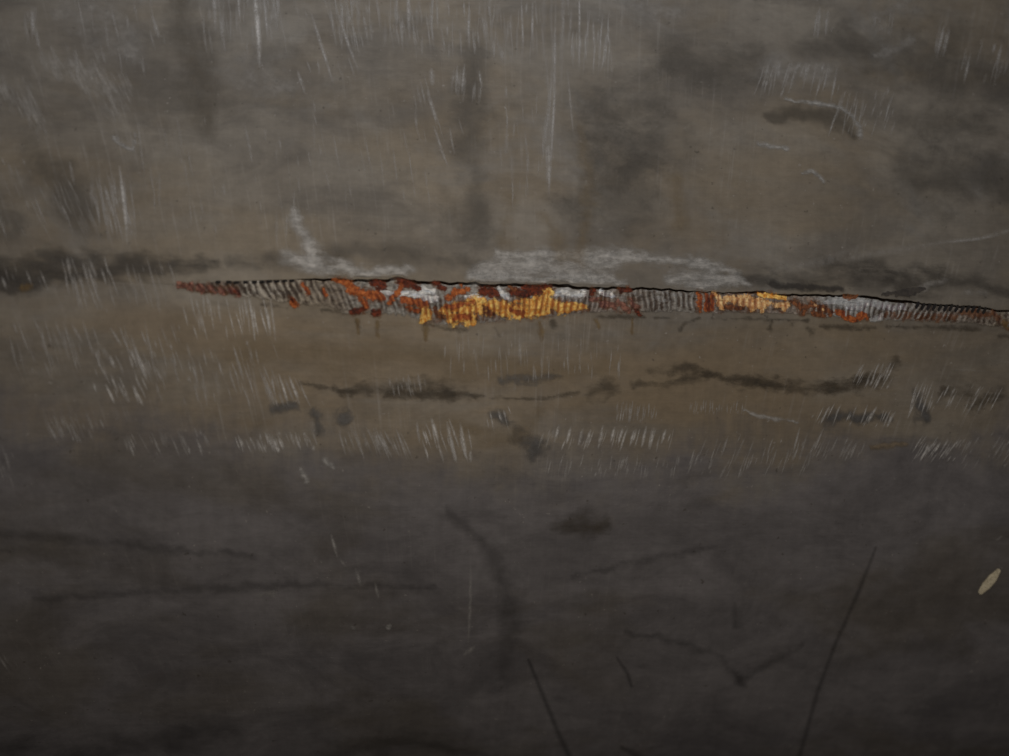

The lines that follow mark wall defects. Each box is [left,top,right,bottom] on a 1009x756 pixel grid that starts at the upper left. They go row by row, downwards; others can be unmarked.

leakage [284,209,412,277]
leakage [0,252,179,294]
rust [175,281,241,298]
rust [289,278,642,341]
crack [215,277,1009,314]
leakage [468,250,843,292]
rust [696,291,869,323]